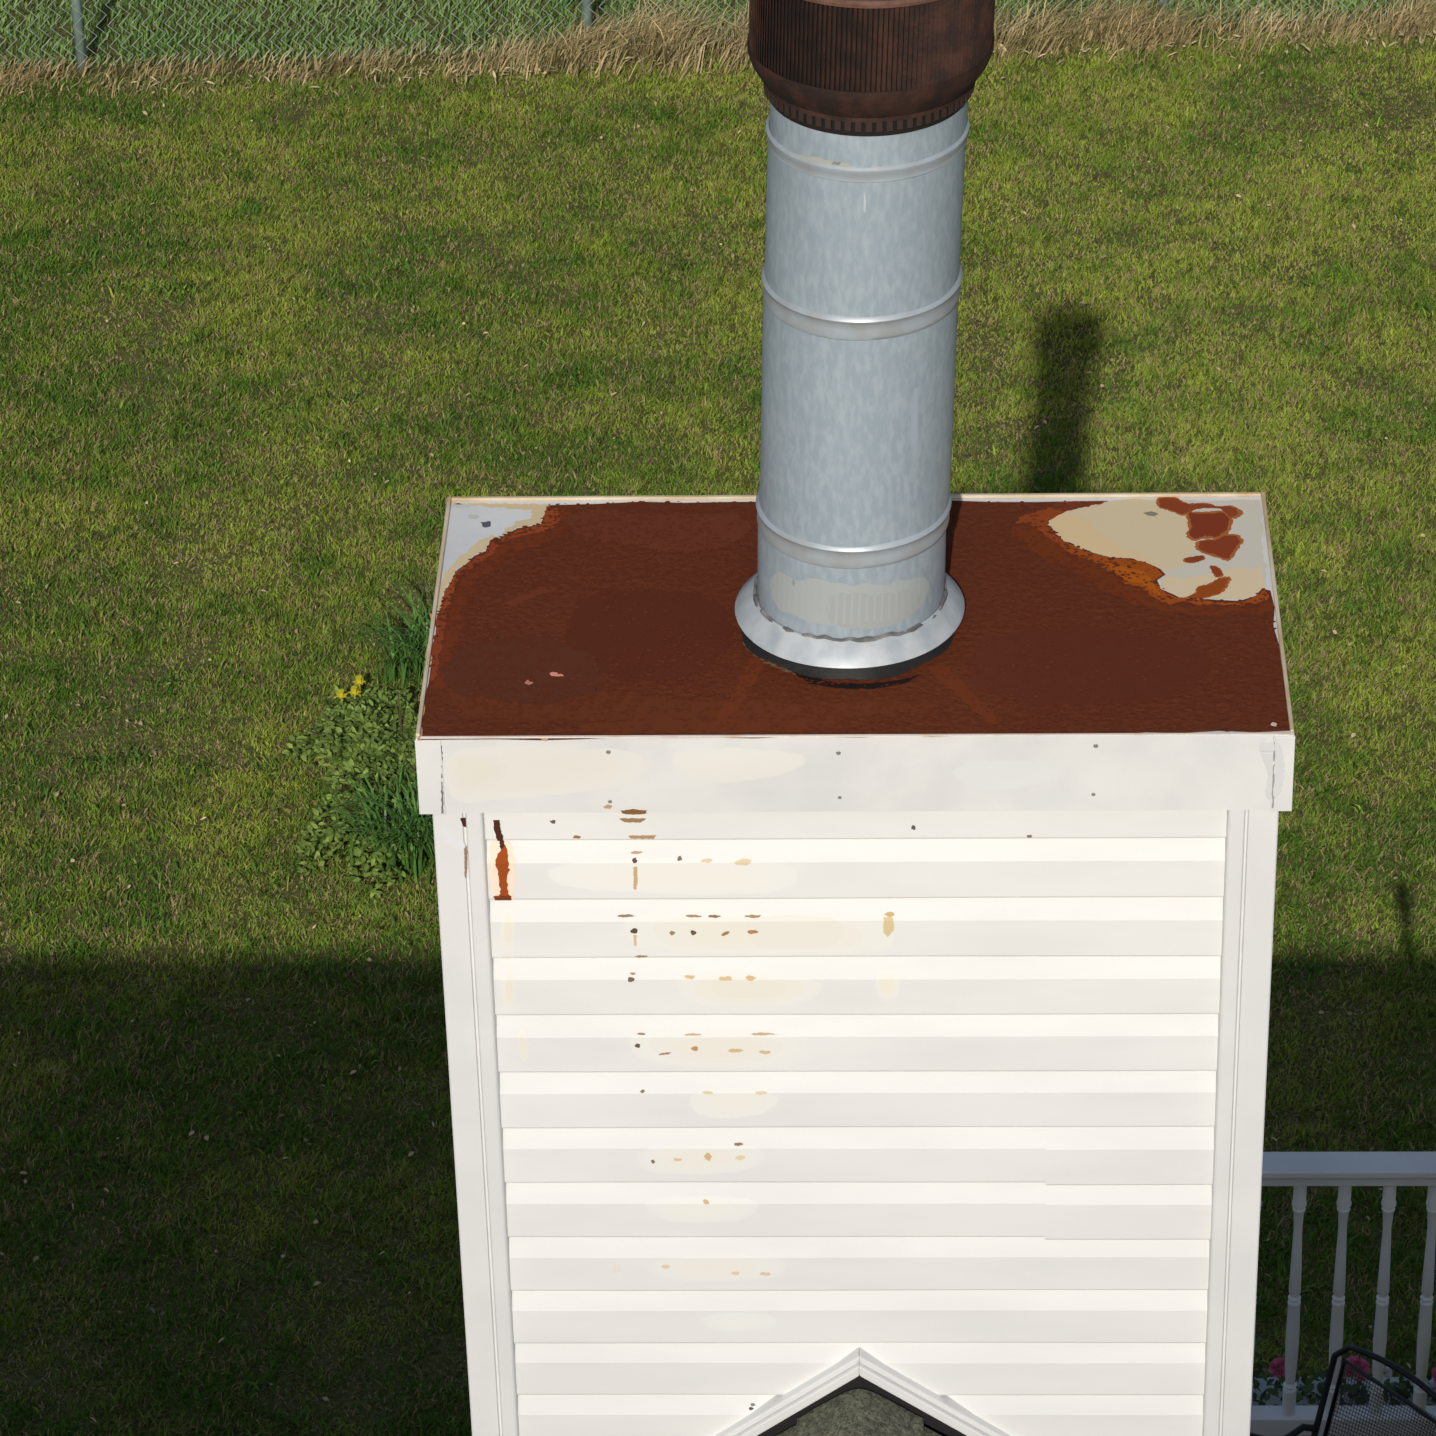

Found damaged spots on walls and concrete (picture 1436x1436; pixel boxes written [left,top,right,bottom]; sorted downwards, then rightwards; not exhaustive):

corrosion [421,497,1290,740]
corrosion [488,820,517,900]
corrosion [604,804,656,890]
corrosion [670,915,729,936]
corrosion [883,912,895,937]
corrosion [728,1032,777,1054]